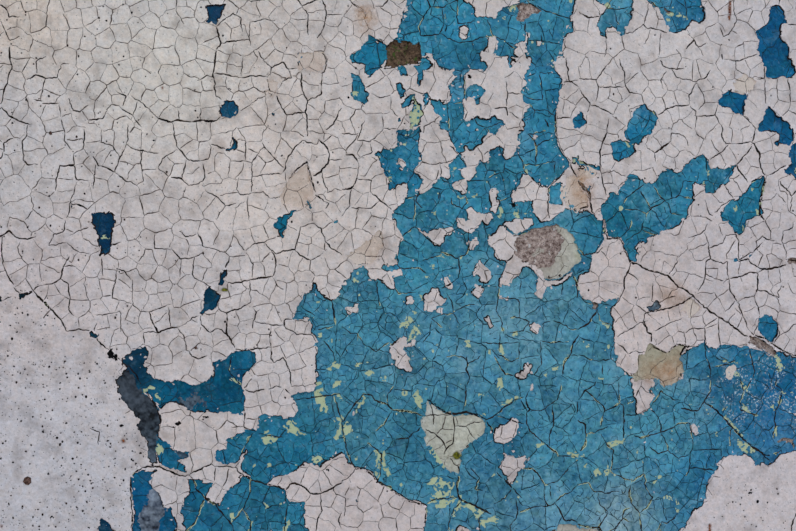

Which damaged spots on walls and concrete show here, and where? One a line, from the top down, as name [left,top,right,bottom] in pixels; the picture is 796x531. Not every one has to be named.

crack [621,0,796,116]
crack [703,175,738,212]
peeling [91,211,116,256]
peeling [180,0,796,531]
crack [116,352,159,387]
peeling [115,346,256,531]
peeling [98,518,114,531]
crack [164,500,191,530]